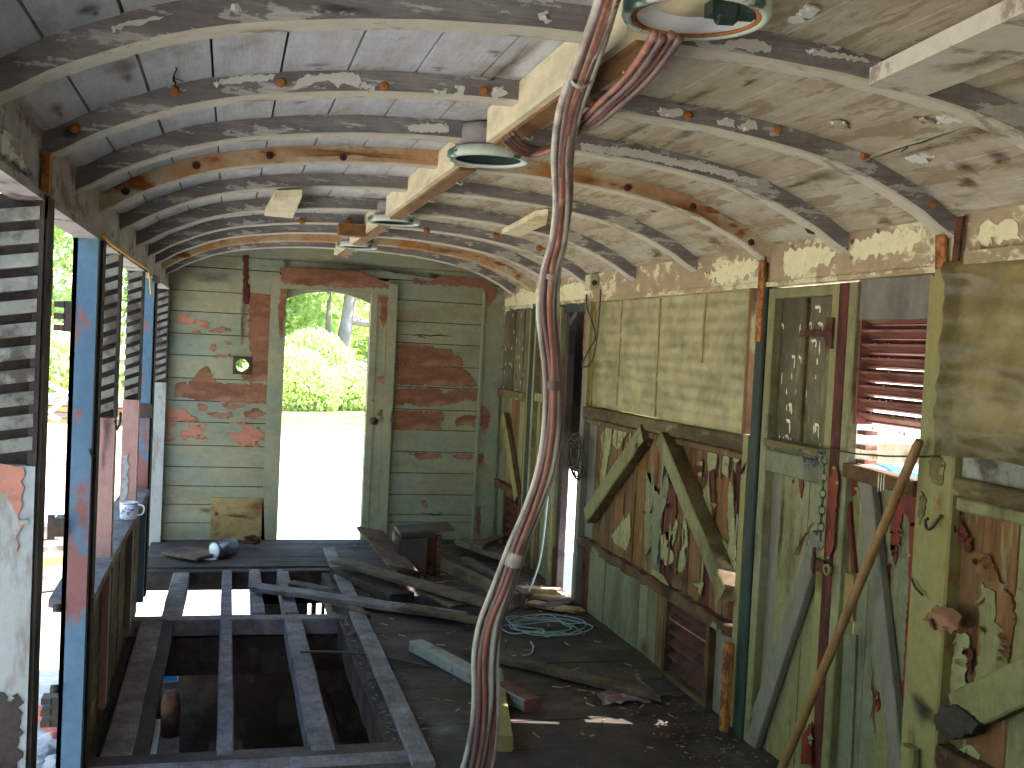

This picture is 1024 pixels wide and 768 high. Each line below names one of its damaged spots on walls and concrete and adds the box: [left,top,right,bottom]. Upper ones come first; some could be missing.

peeling [292,72,375,94]
crack [872,130,956,159]
peeling [783,242,836,280]
peeling [850,226,923,263]
peeling [978,219,1021,250]
peeling [165,255,389,447]
peeling [377,343,491,435]
peeling [595,427,634,492]
peeling [0,463,28,550]
peeling [612,486,631,551]
peeling [643,454,688,586]
peeling [929,582,1024,692]